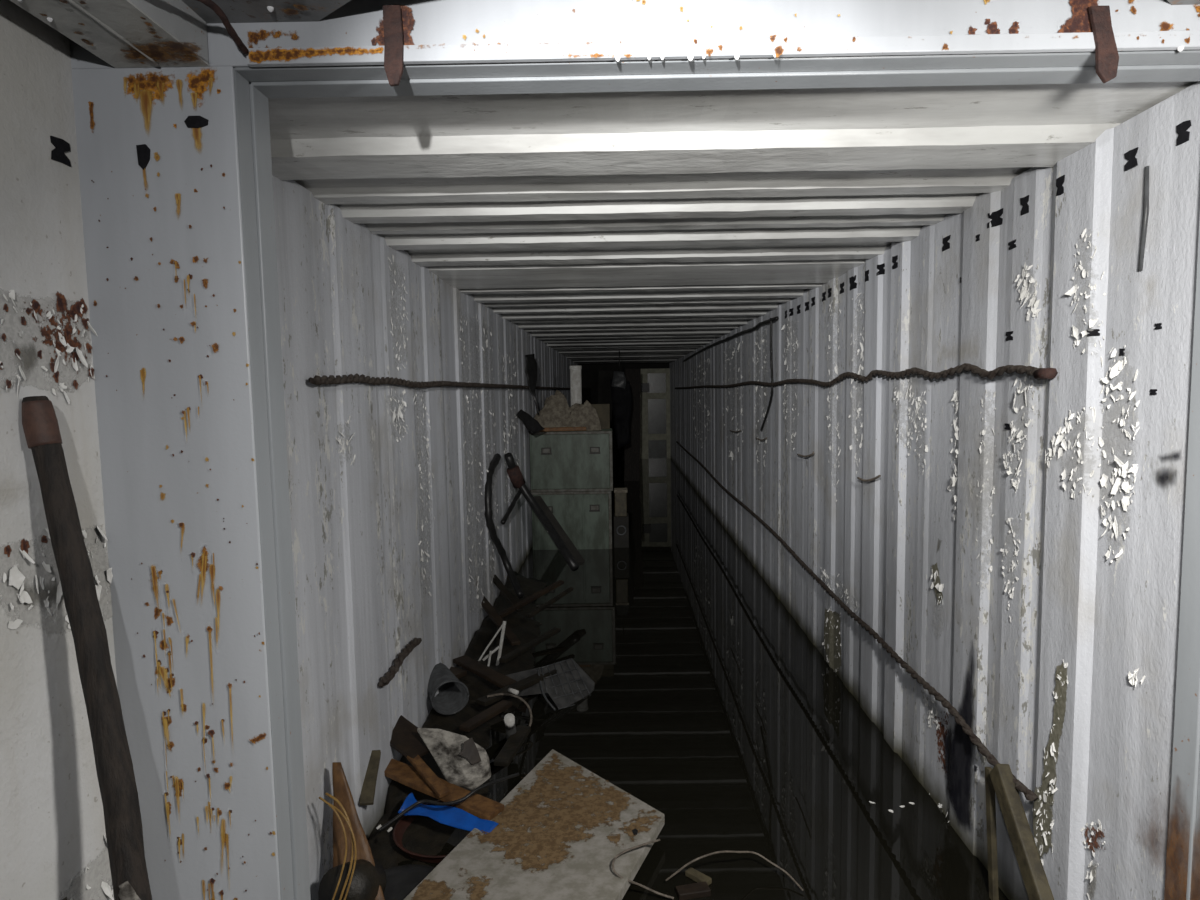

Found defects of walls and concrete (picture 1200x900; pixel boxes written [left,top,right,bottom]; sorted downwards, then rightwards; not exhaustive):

rust [248,20,384,63]
rust [400,6,423,47]
rust [1058,0,1098,39]
rust [1160,22,1190,43]
peeling [0,290,97,404]
peeling [1045,228,1140,563]
peeling [3,528,71,629]
peeling [95,568,113,601]
rust [141,520,247,900]
peeling [1033,660,1068,865]
peeling [62,867,114,900]
rust [1153,807,1200,900]